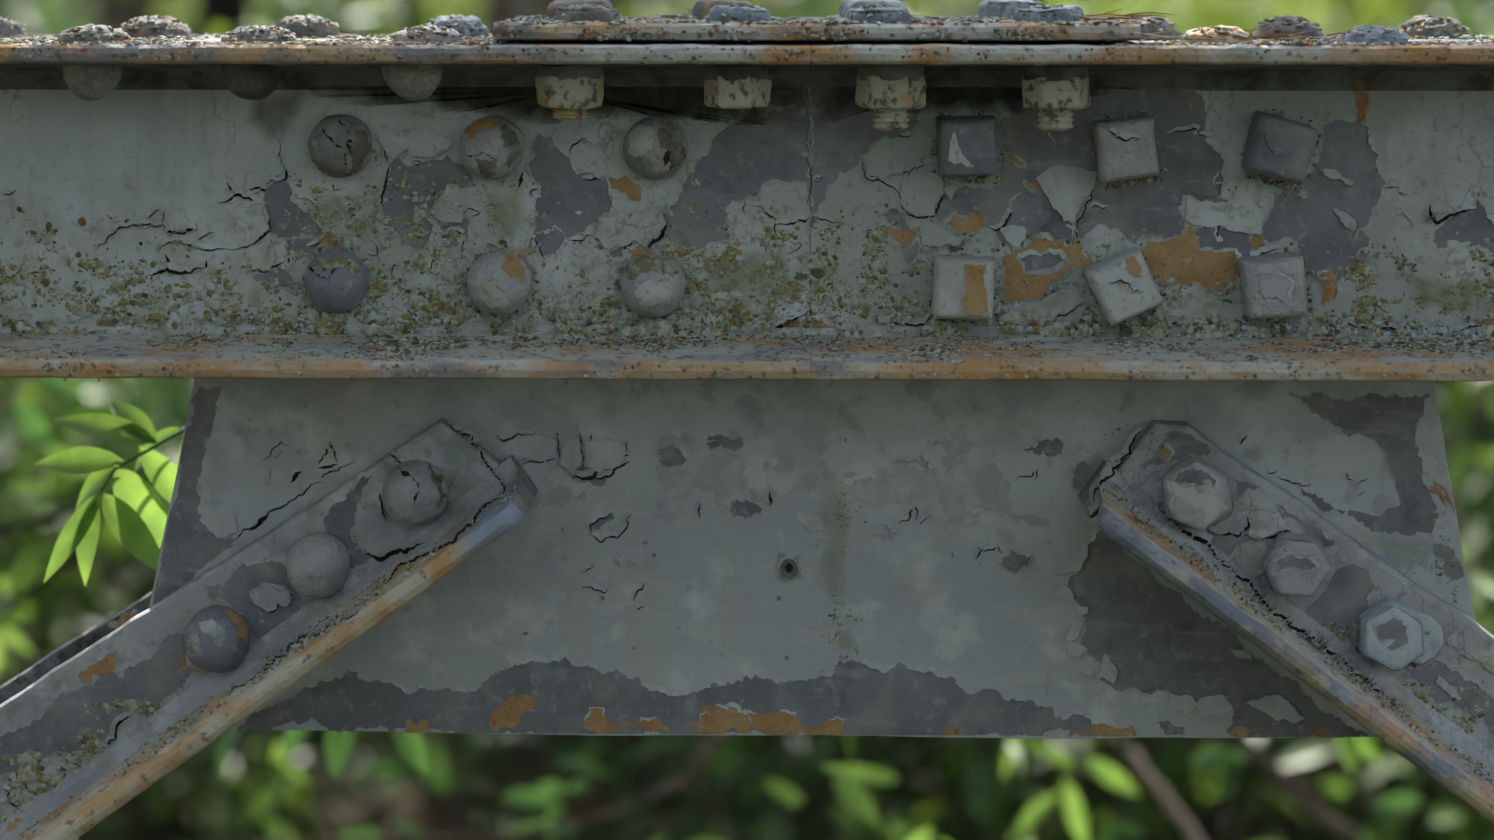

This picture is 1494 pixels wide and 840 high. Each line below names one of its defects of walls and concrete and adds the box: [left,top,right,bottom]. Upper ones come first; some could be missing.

crack [92,120,481,280]
crack [529,217,668,260]
peeling [311,67,1388,322]
corrosion [961,238,1092,317]
crack [989,190,1107,244]
corrosion [1125,226,1263,294]
peeling [153,384,301,639]
crack [223,421,645,695]
peeling [1064,526,1368,737]
corrosion [489,694,538,732]
peeling [237,654,1136,736]
corrosion [582,702,846,735]